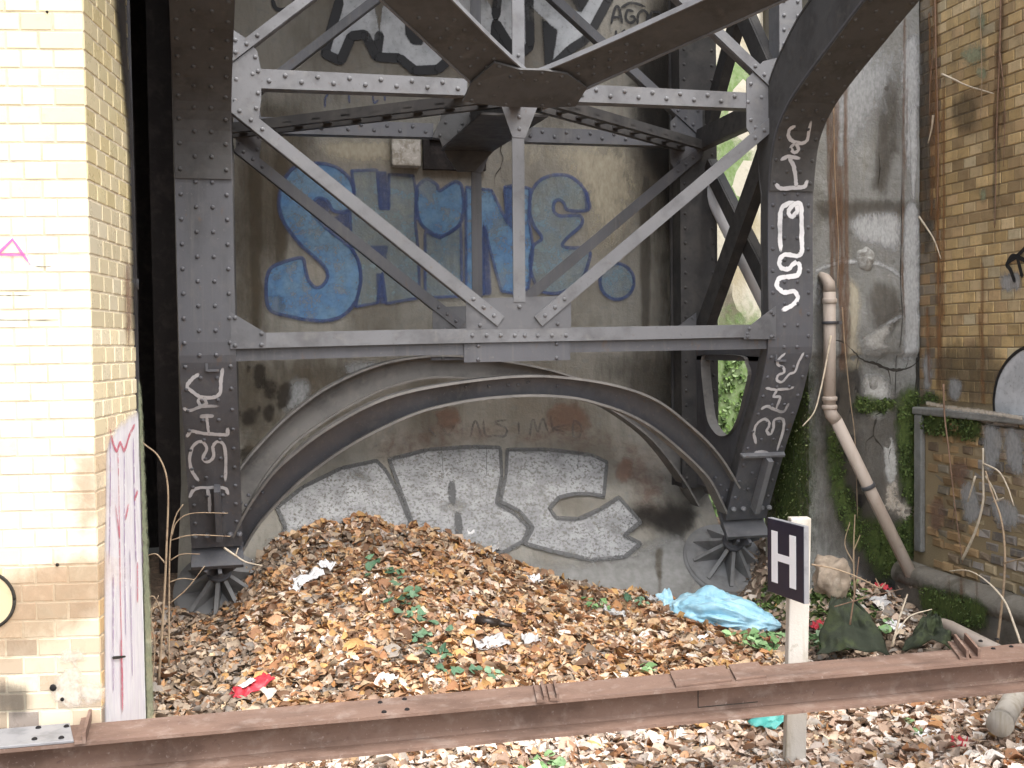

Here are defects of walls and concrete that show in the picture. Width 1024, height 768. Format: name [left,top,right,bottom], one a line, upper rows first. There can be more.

damp [242,367,328,451]
rust [827,99,849,369]
crack [836,198,923,471]
damp [819,22,1023,474]
damp [843,520,891,588]